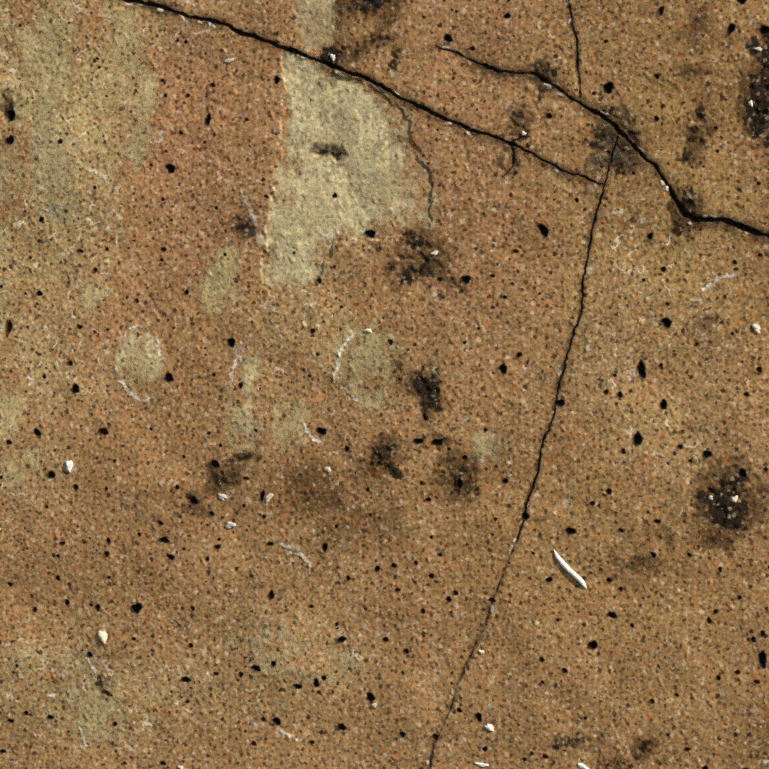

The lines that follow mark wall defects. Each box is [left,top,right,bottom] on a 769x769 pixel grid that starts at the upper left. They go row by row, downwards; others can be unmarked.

crack [123,0,769,683]